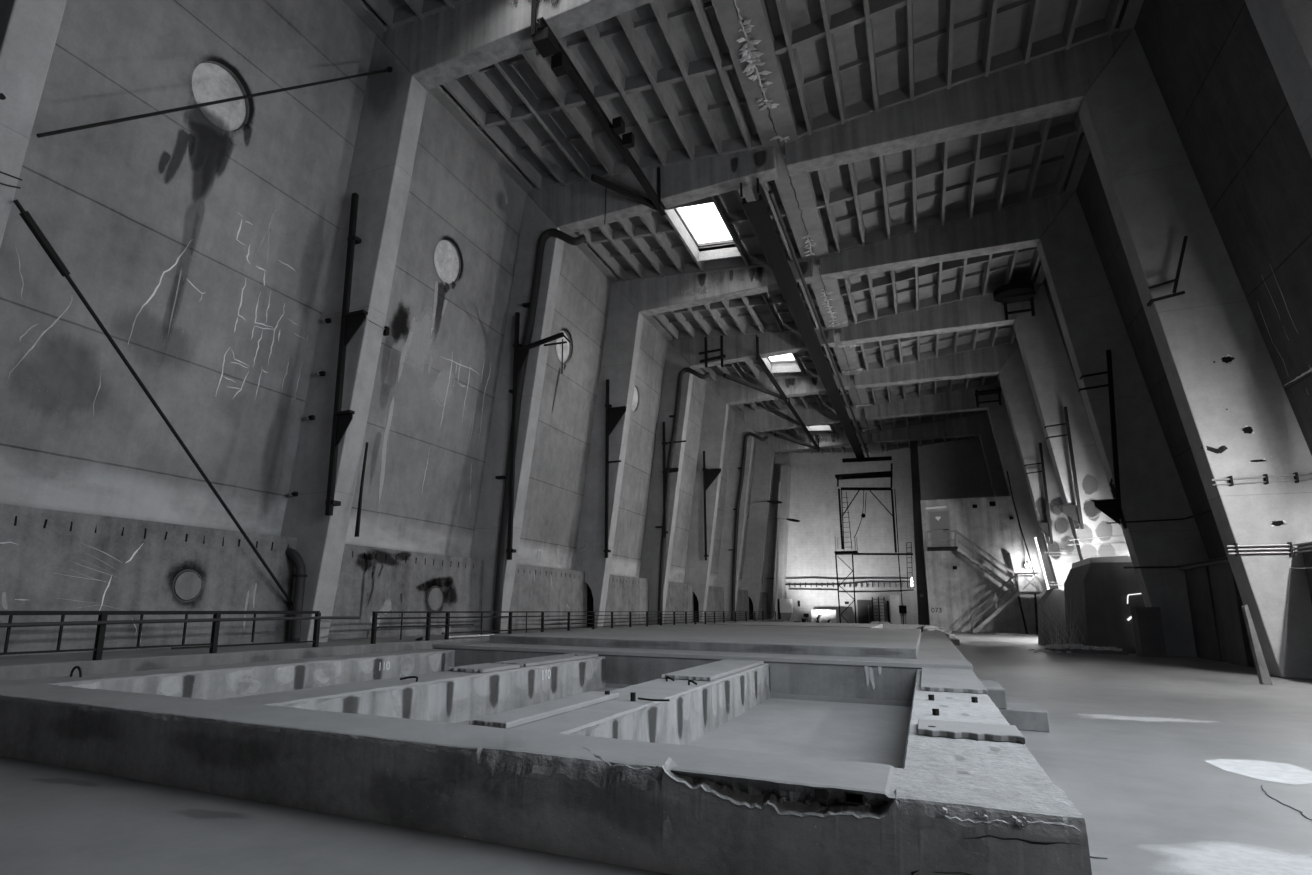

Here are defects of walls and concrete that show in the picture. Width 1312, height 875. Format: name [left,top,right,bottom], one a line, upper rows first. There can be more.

damp [159,57,255,199]
crack [128,239,206,344]
crack [216,214,308,399]
damp [398,236,463,381]
damp [379,397,394,502]
damp [356,550,411,638]
spalling [580,745,898,820]
crack [1261,785,1312,820]